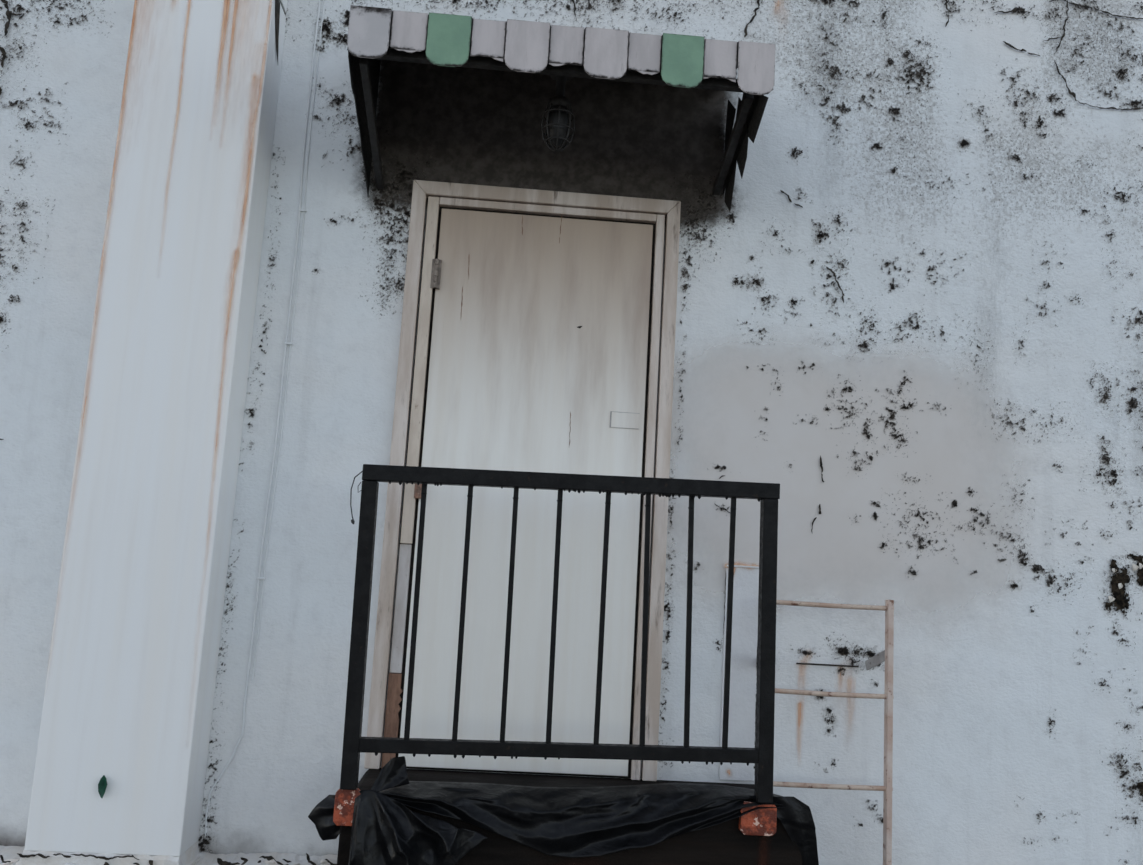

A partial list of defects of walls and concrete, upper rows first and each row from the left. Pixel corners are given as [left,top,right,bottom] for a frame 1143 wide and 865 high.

water stain [0,0,101,280]
rust [120,0,136,122]
rust [218,0,238,71]
rust [243,147,251,220]
water stain [311,60,736,324]
crack [744,0,760,37]
water stain [788,0,951,145]
water stain [958,67,1067,153]
water stain [930,0,1143,120]
crack [995,0,1143,110]
water stain [675,215,1143,602]
water stain [663,496,760,642]